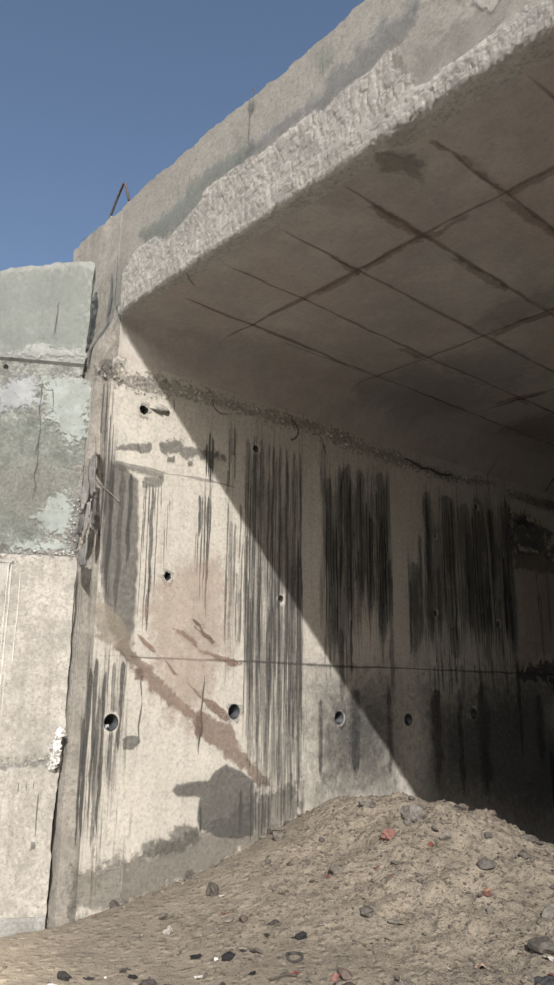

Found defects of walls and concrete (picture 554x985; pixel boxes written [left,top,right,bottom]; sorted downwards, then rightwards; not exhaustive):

crack [88,273,113,365]
damp [70,385,303,912]
damp [321,461,393,674]
damp [408,498,554,658]